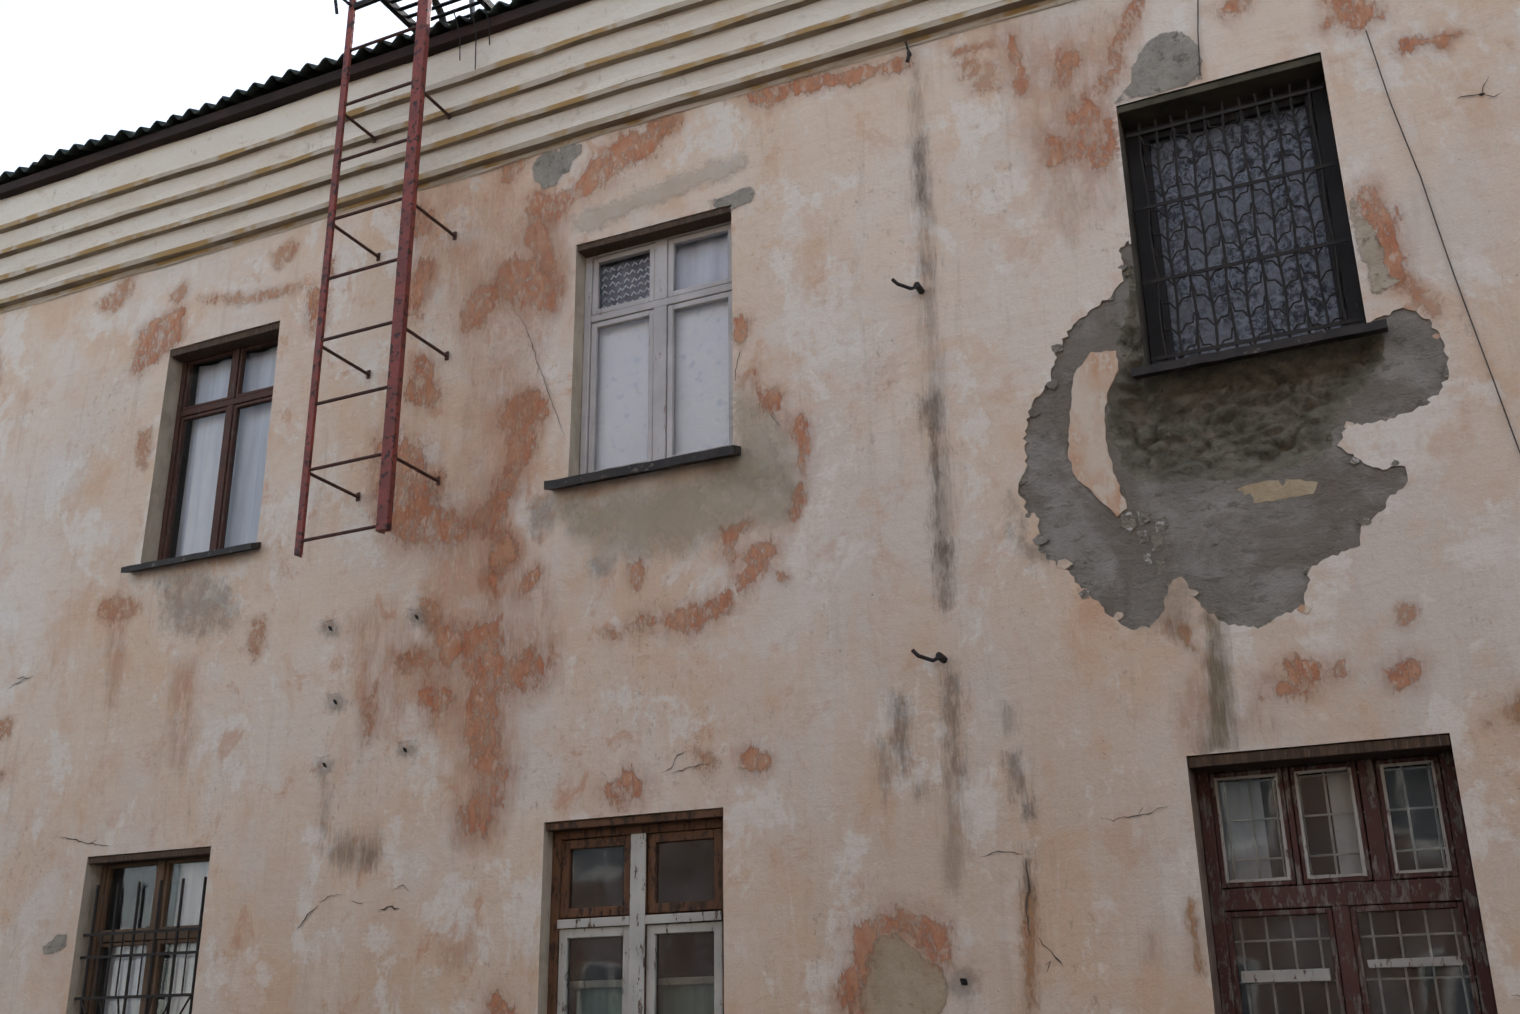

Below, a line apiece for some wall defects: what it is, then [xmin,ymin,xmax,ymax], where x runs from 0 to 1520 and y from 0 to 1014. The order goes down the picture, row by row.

peeling [747,57,910,108]
peeling [953,34,1030,96]
peeling [1044,0,1145,169]
peeling [460,114,682,333]
flaking render [1017,186,1449,630]
peeling [369,388,551,839]
peeling [837,904,952,1014]